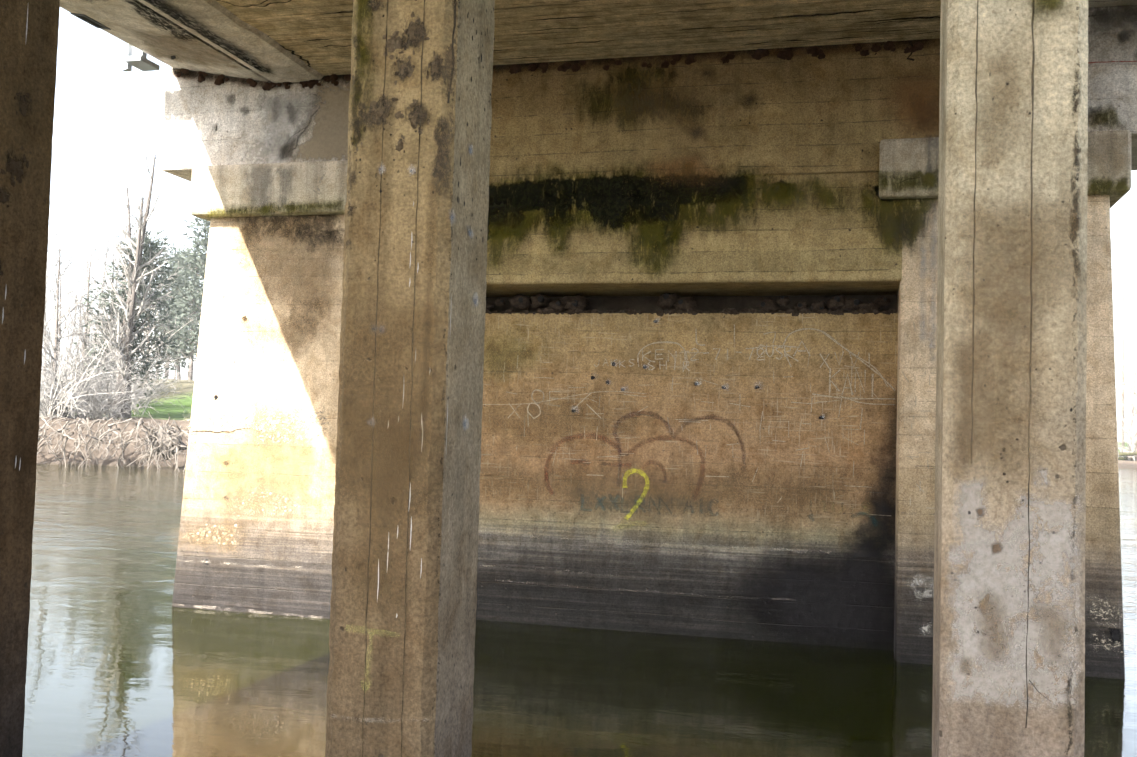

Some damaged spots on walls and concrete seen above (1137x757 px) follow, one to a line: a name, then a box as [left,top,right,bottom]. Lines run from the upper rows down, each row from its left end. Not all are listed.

leakage [879,171,936,192]
leakage [1090,178,1128,193]
leakage [590,194,680,251]
crack [1025,0,1051,728]
leakage [740,414,897,650]